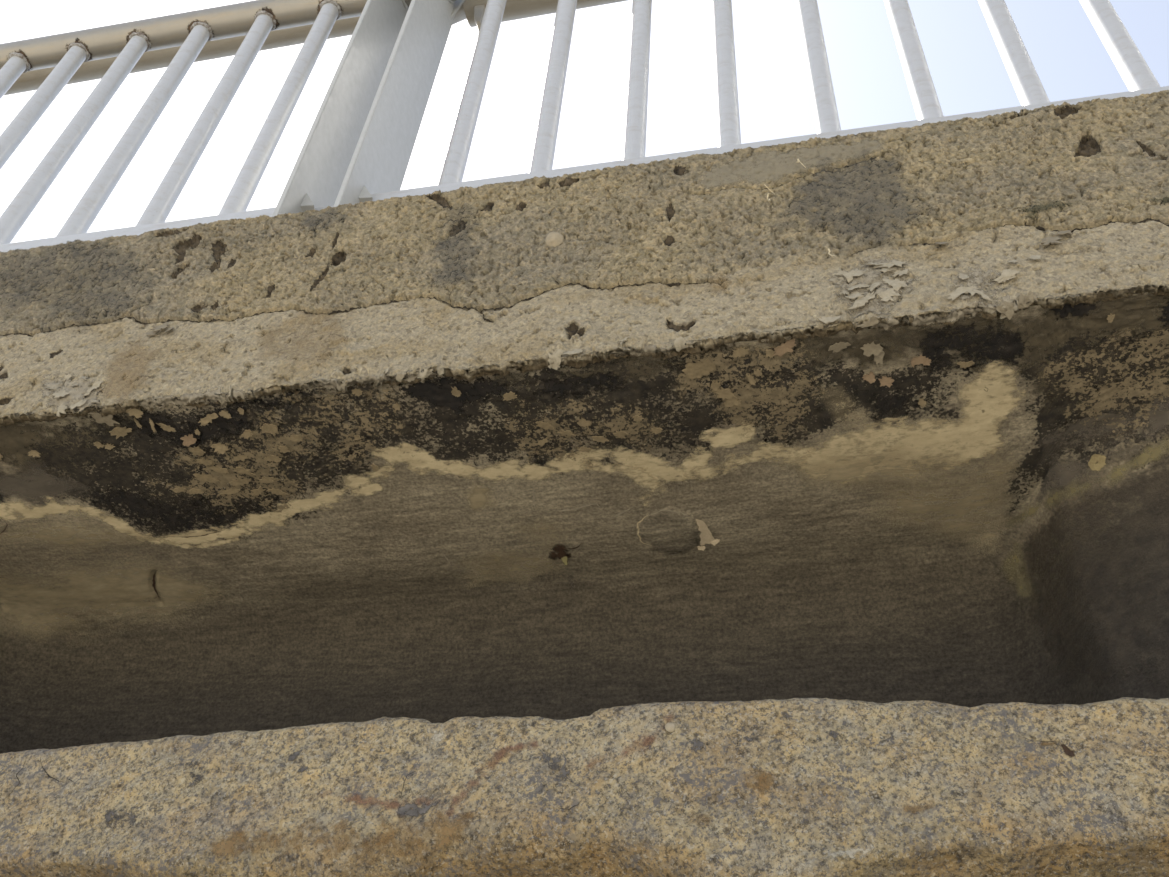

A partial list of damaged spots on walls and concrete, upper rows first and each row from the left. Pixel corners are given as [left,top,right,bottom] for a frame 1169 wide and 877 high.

crack [985,218,1169,241]
crack [3,277,719,337]
spalling [548,323,585,370]
peeling [609,254,1041,442]
damp [0,299,1169,684]